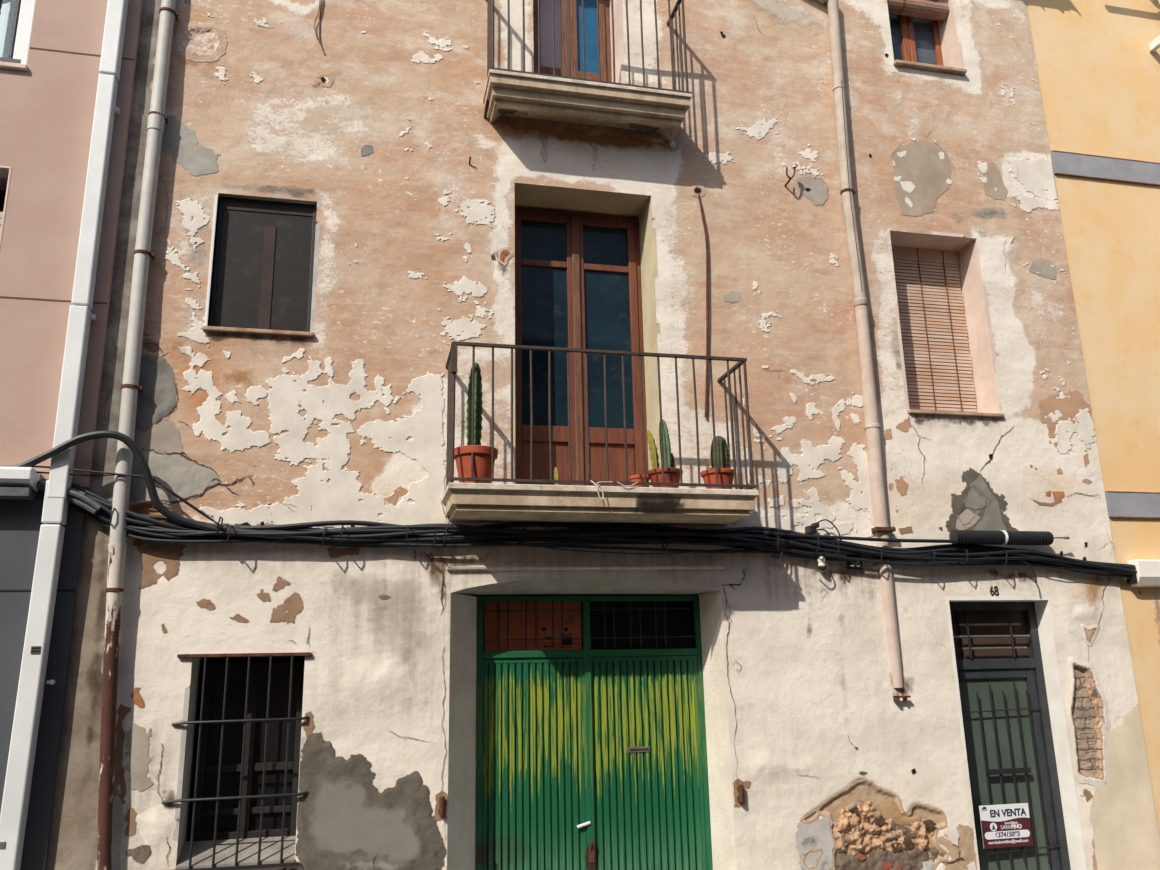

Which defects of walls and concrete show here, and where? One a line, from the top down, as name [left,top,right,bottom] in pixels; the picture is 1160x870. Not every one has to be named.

peeling [438,182,495,228]
peeling [437,247,514,345]
peeling [141,198,450,528]
crack [130,383,254,503]
peeling [740,392,875,537]
crack [955,426,1014,525]
peeling [133,539,186,588]
peeling [196,599,215,610]
peeling [257,576,303,624]
crack [722,569,748,780]
flaking render [1065,624,1110,802]
flaking render [800,771,977,870]